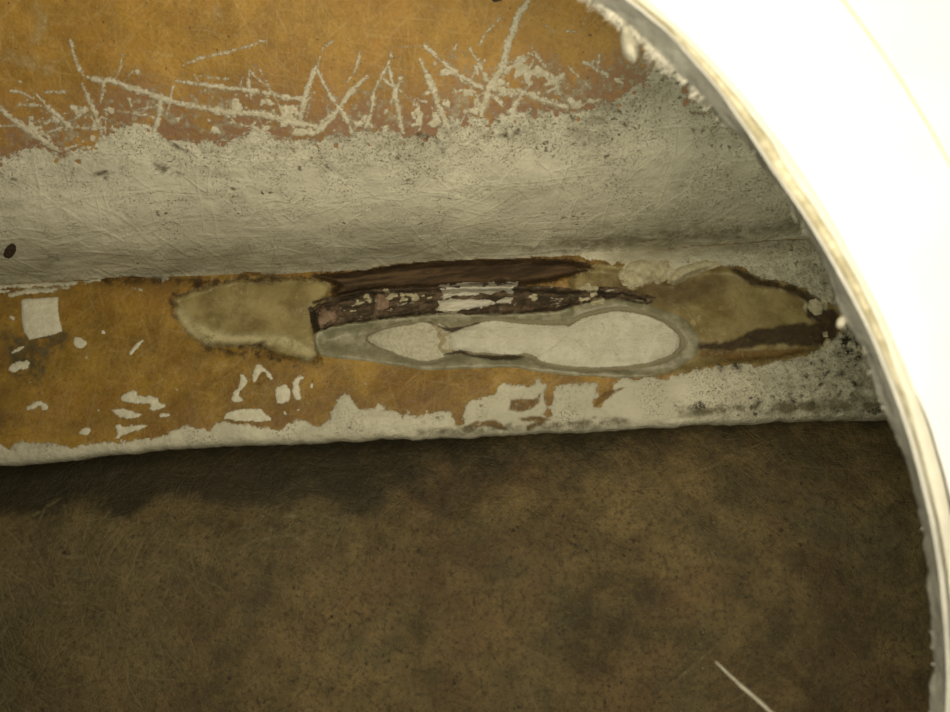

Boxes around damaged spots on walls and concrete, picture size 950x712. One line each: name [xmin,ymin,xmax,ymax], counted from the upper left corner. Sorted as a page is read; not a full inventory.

peeling [0,279,101,297]
corrosion [310,257,593,296]
peeling [618,259,722,290]
peeling [803,295,828,320]
peeling [8,346,30,373]
peeling [73,337,87,359]
peeling [818,331,835,350]
peeling [26,401,48,411]
peeling [112,390,170,439]
peeling [224,364,313,422]